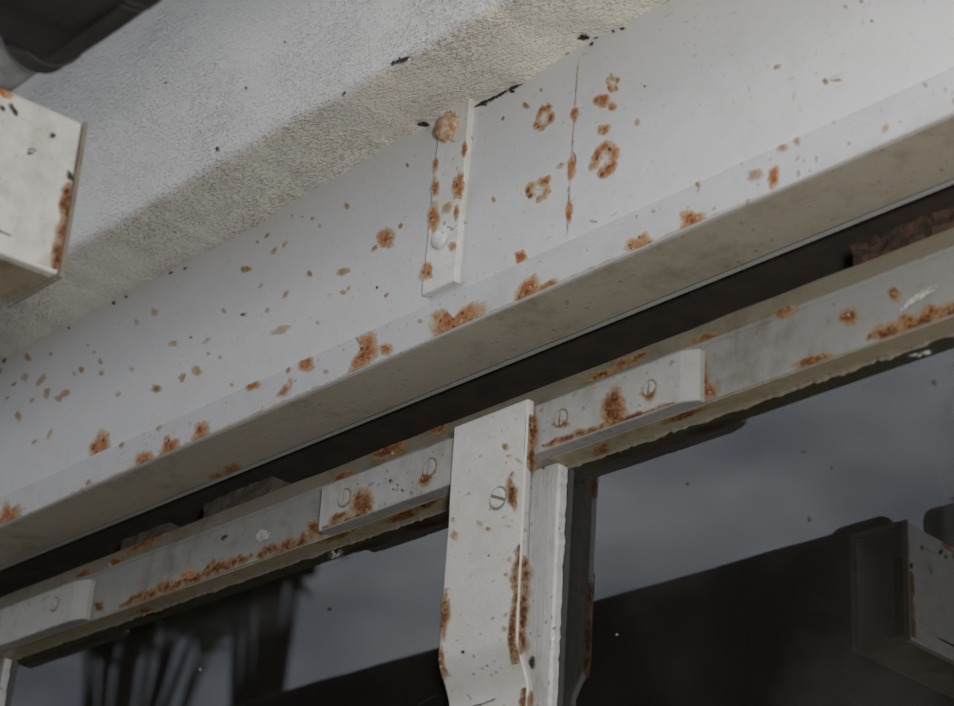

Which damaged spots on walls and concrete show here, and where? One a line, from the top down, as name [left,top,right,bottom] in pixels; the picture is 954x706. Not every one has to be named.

corrosion [593,73,619,110]
corrosion [51,182,72,270]
corrosion [428,158,464,231]
corrosion [589,125,619,178]
corrosion [432,302,485,335]
corrosion [514,274,557,301]
corrosion [53,332,392,502]
corrosion [524,358,716,472]
corrosion [506,472,517,508]
corrosion [119,489,372,613]
corrosion [438,592,450,678]
corrosion [504,544,533,665]